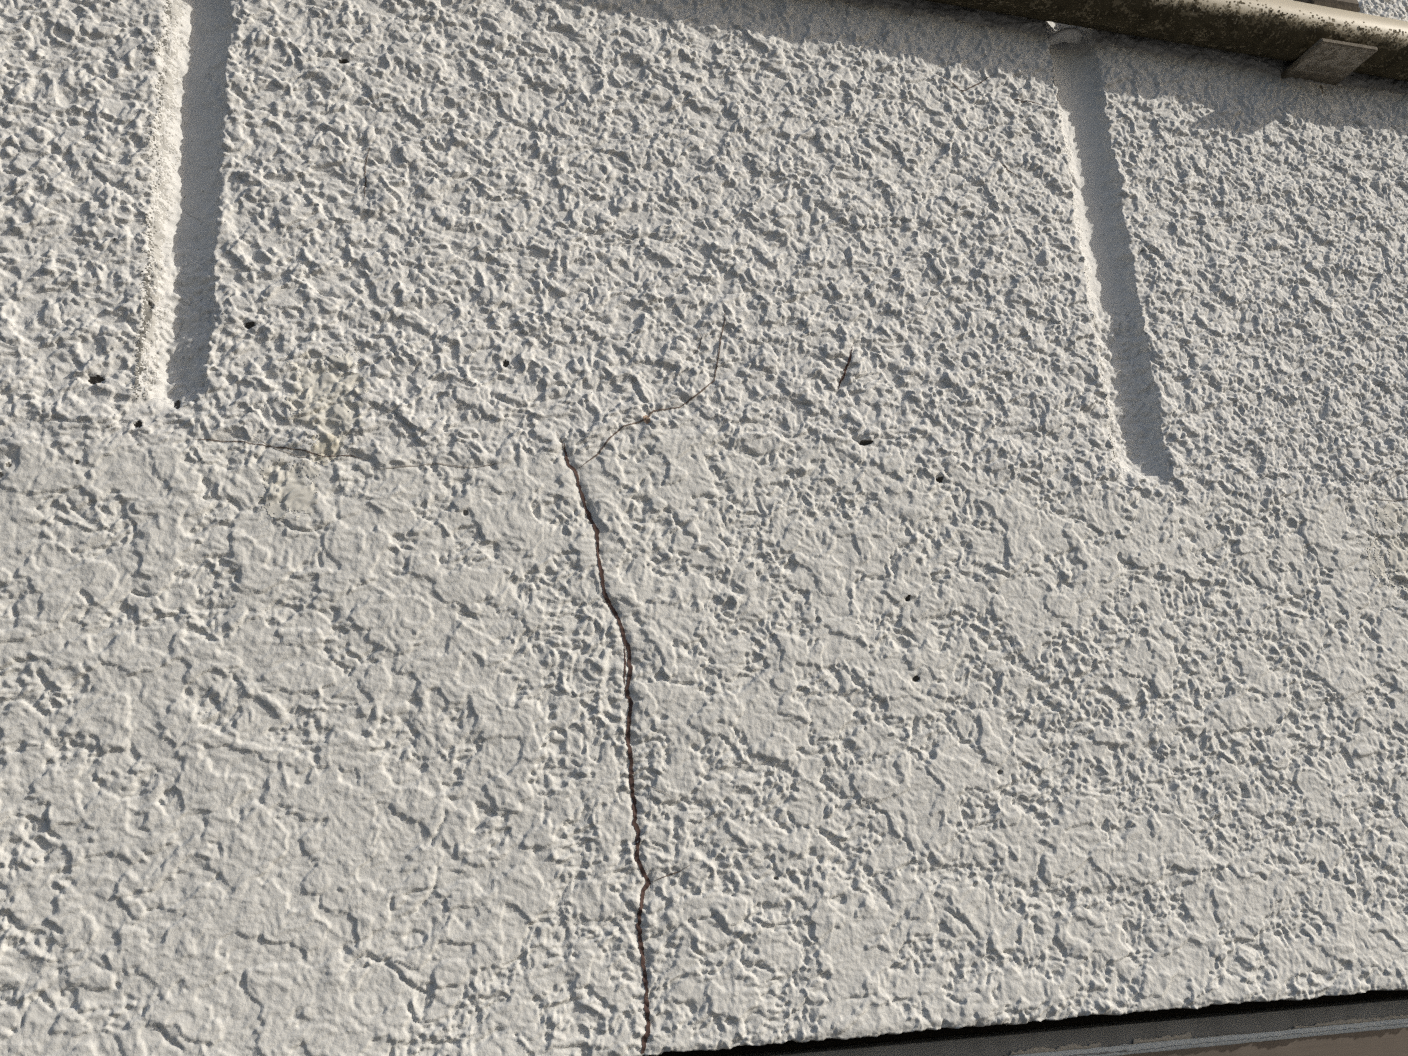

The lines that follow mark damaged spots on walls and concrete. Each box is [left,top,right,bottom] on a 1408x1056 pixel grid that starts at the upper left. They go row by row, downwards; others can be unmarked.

crack [196,432,502,470]
crack [556,315,725,1054]